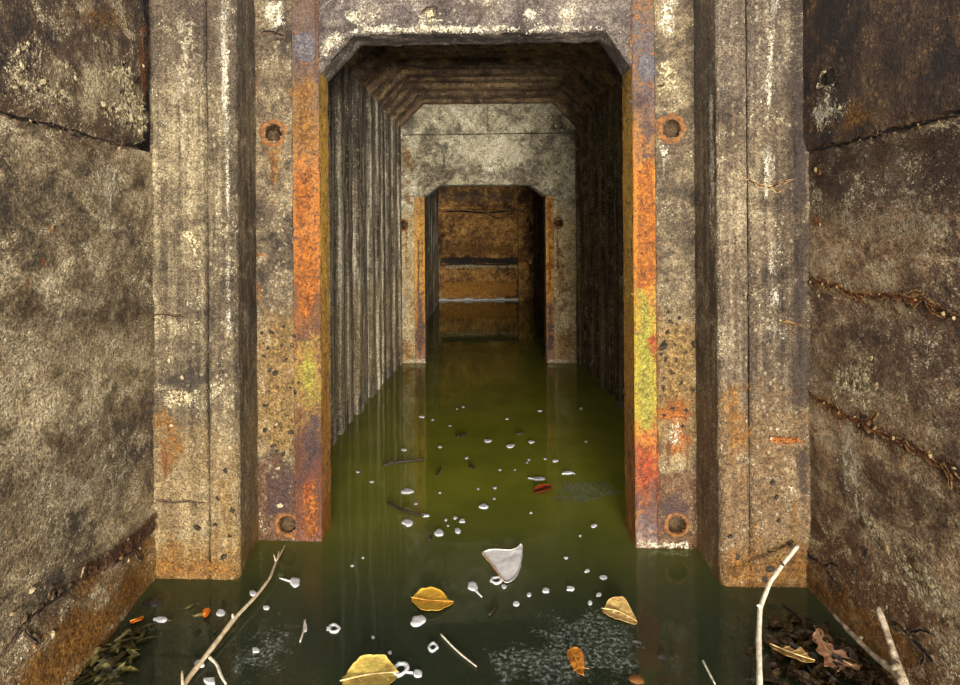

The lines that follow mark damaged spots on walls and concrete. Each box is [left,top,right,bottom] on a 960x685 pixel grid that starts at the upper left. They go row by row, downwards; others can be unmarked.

crack [0,109,138,152]
crack [809,113,960,154]
corrosion [295,164,317,318]
corrosion [630,91,696,540]
crack [808,276,960,320]
corrosion [152,404,184,482]
corrosion [263,339,320,538]
crack [808,392,960,490]
crack [111,528,155,566]
crack [0,582,79,657]